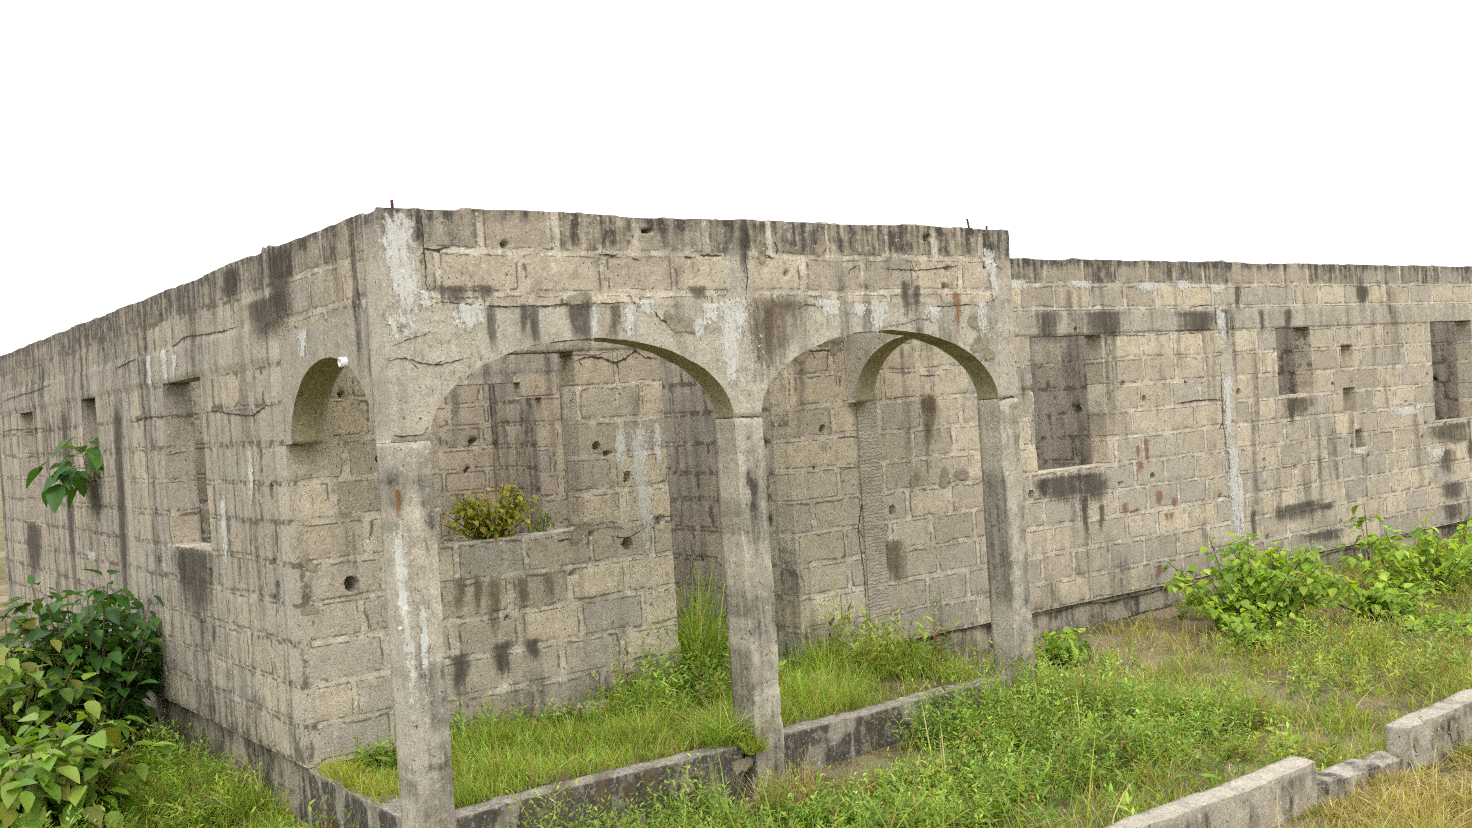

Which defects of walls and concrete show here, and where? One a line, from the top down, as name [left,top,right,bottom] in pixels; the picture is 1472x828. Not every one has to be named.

damp [740,219,749,267]
damp [222,268,237,300]
damp [248,248,294,339]